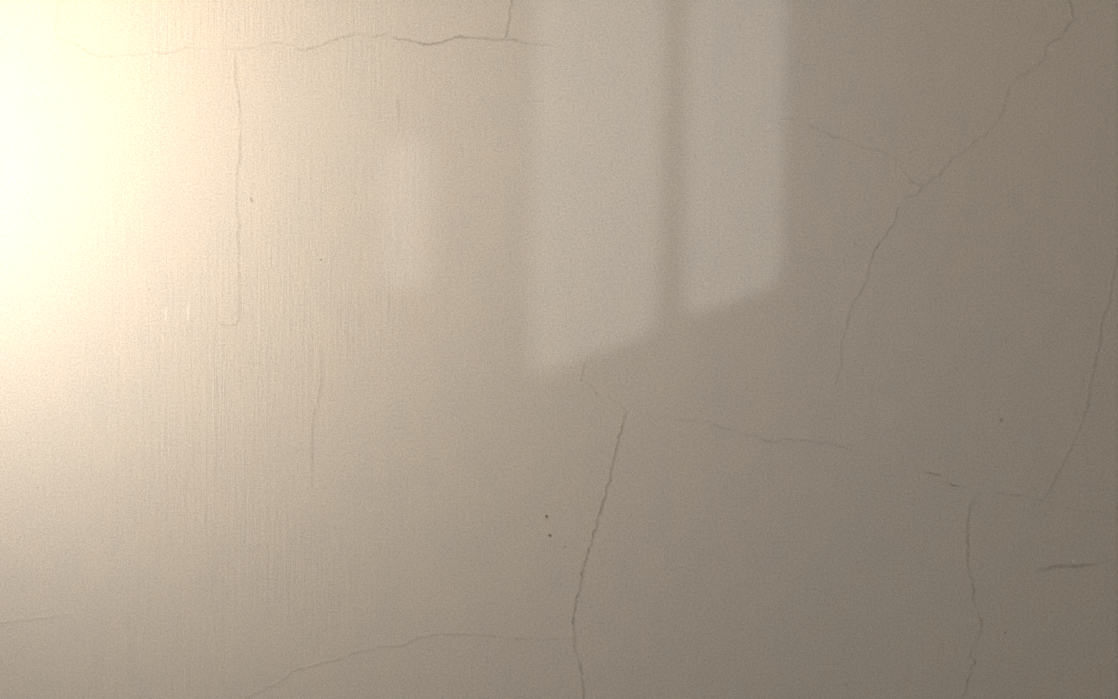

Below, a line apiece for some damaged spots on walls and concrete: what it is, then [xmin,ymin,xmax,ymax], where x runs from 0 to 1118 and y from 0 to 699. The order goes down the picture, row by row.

crack [53,0,560,328]